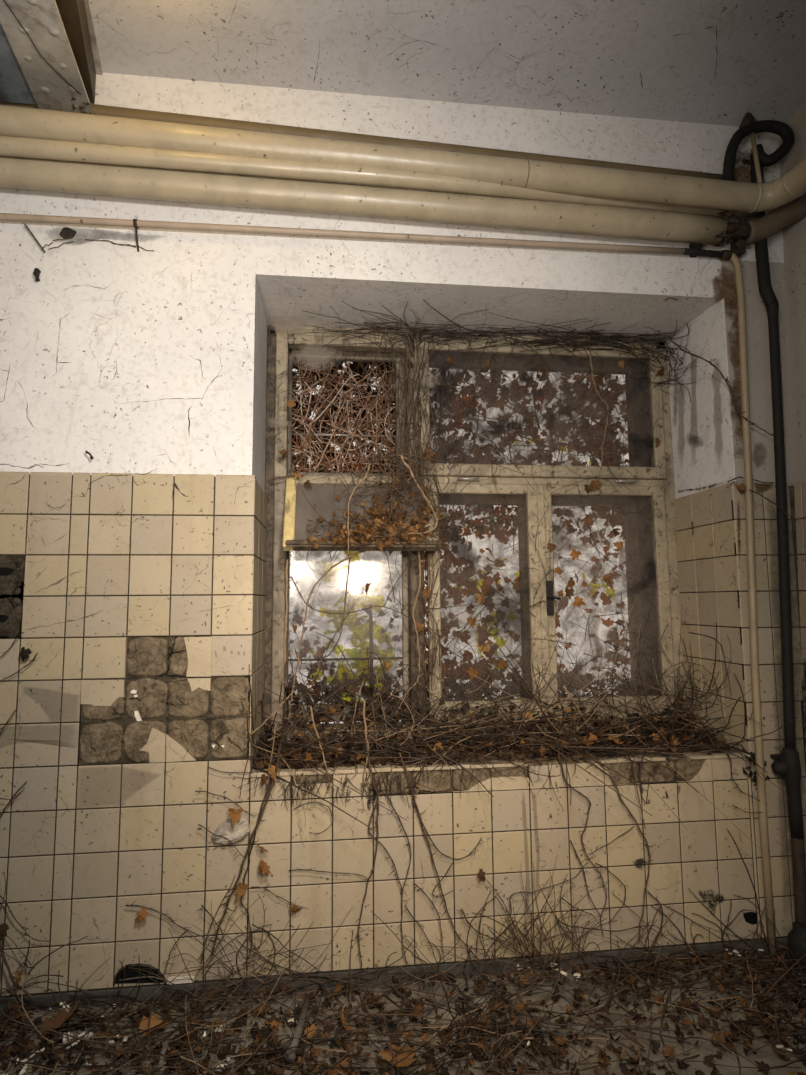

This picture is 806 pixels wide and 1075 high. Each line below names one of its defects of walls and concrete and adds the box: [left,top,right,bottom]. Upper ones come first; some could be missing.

crack [50,285,110,376]
crack [0,362,37,429]
crack [114,351,221,455]
crack [0,462,69,470]
spalling [0,555,25,638]
spalling [79,636,252,765]